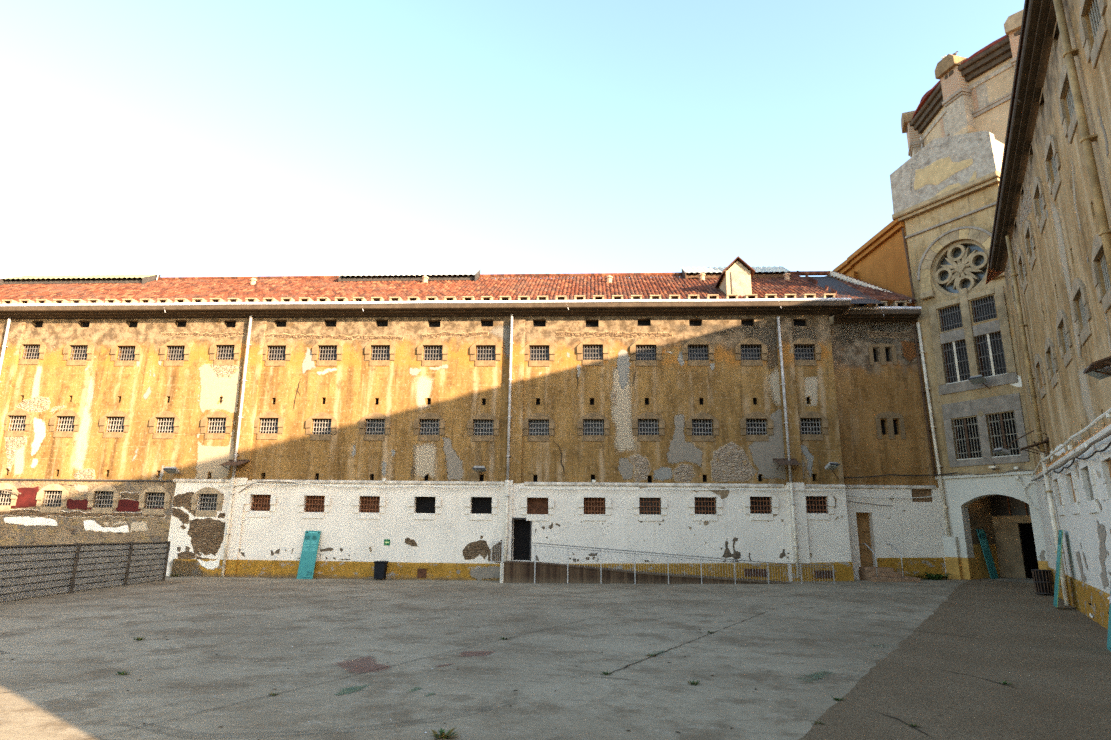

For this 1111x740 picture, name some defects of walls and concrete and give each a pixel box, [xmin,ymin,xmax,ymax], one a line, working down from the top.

flaking render [0,364,242,570]
flaking render [672,441,757,499]
flaking render [456,536,503,580]
peeling [1076,491,1111,618]